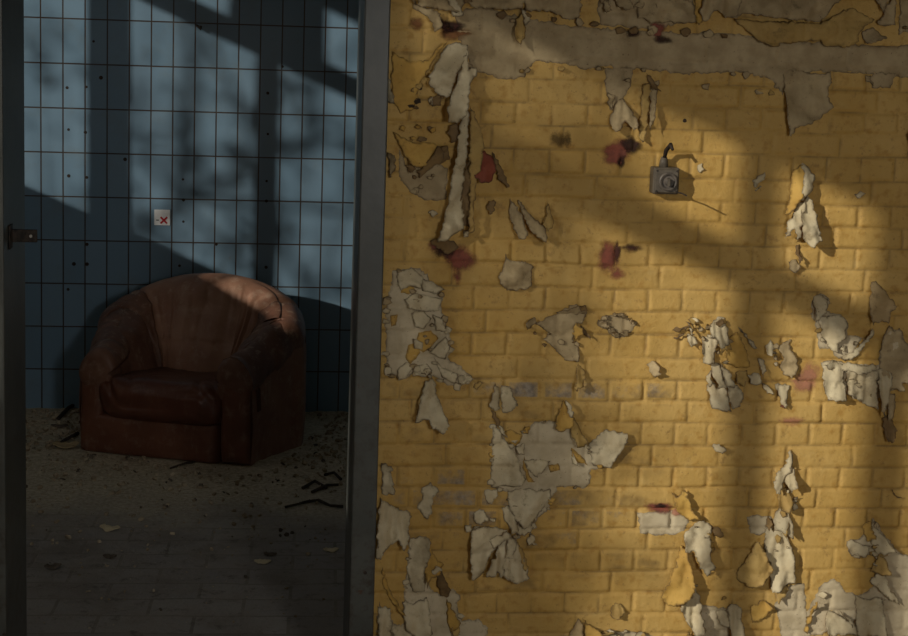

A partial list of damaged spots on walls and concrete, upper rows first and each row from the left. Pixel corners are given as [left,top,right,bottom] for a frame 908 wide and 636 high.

peeling [387,0,908,254]
peeling [381,267,474,435]
peeling [498,255,534,291]
peeling [526,304,591,362]
peeling [597,312,637,338]
peeling [673,316,799,412]
peeling [785,163,823,273]
peeling [811,281,908,443]
peeling [376,463,488,636]
peeling [465,383,629,584]
peeling [569,618,652,636]
peeling [637,450,908,636]